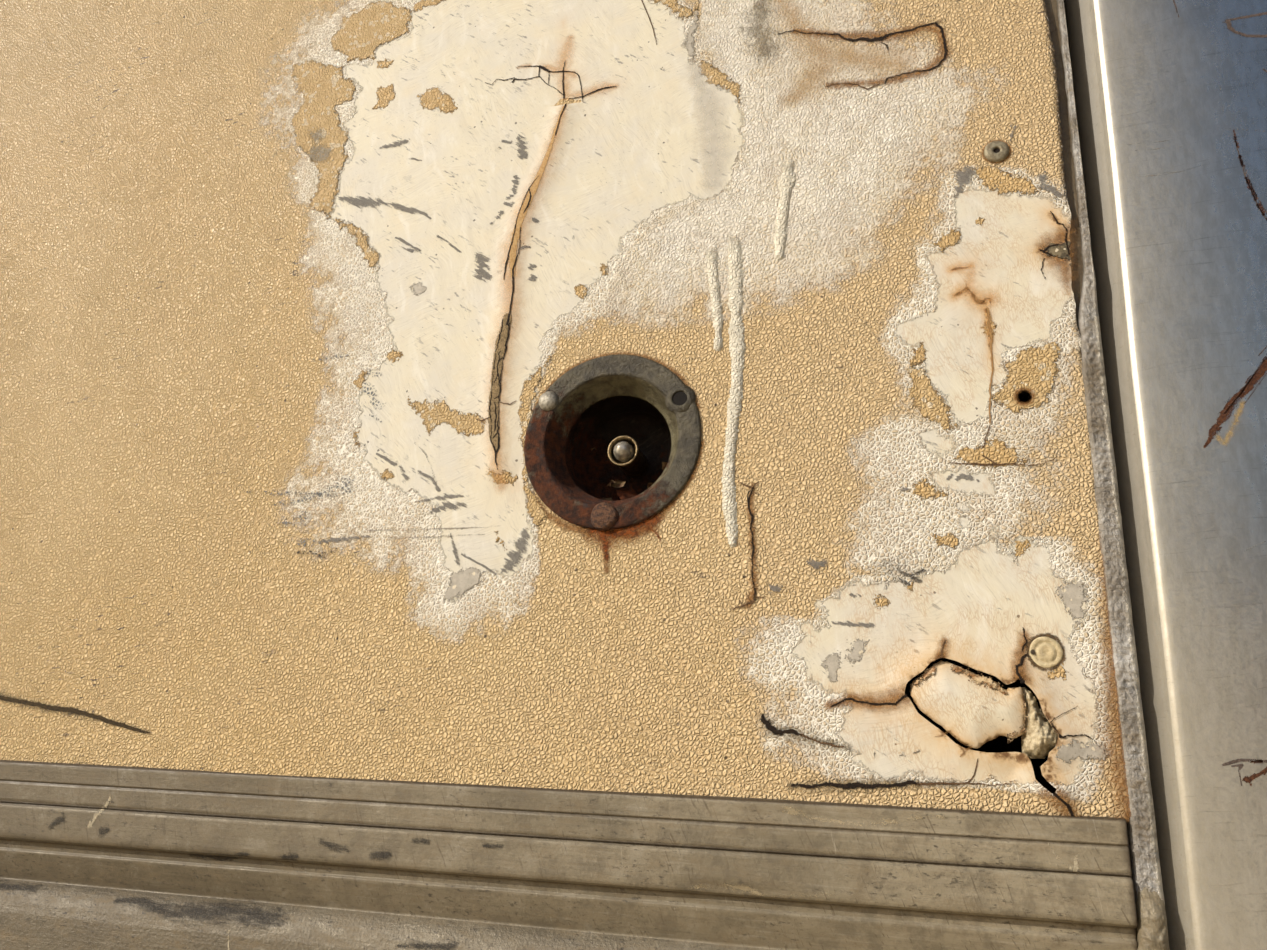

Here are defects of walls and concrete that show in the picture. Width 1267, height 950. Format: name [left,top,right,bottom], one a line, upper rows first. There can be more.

crack [778,21,948,90]
crack [476,60,616,469]
peeling [261,0,1113,802]
crack [950,267,1055,466]
rust [536,441,704,573]
crack [732,481,764,610]
crack [1012,628,1031,684]
crack [761,714,849,749]
crack [825,693,908,709]
crack [788,732,1008,792]
crack [1048,707,1093,740]
crack [1043,790,1075,817]